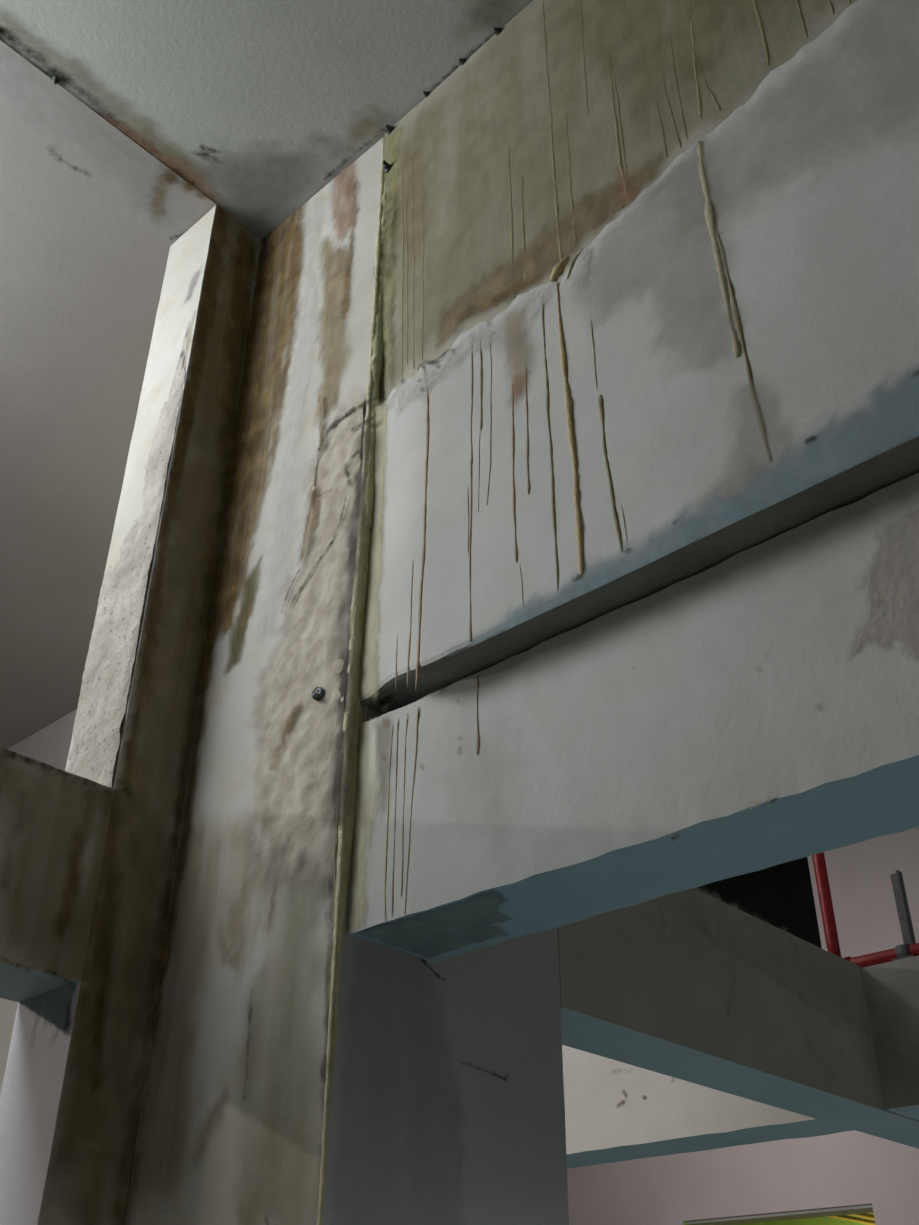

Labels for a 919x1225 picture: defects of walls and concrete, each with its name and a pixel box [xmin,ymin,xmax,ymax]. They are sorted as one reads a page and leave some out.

corrosion [320,163,355,442]
damp [370,292,384,402]
corrosion [436,167,654,345]
crack [281,395,377,613]
damp [347,475,369,604]
damp [66,210,247,1225]
damp [331,626,352,822]
damp [321,940,333,1083]